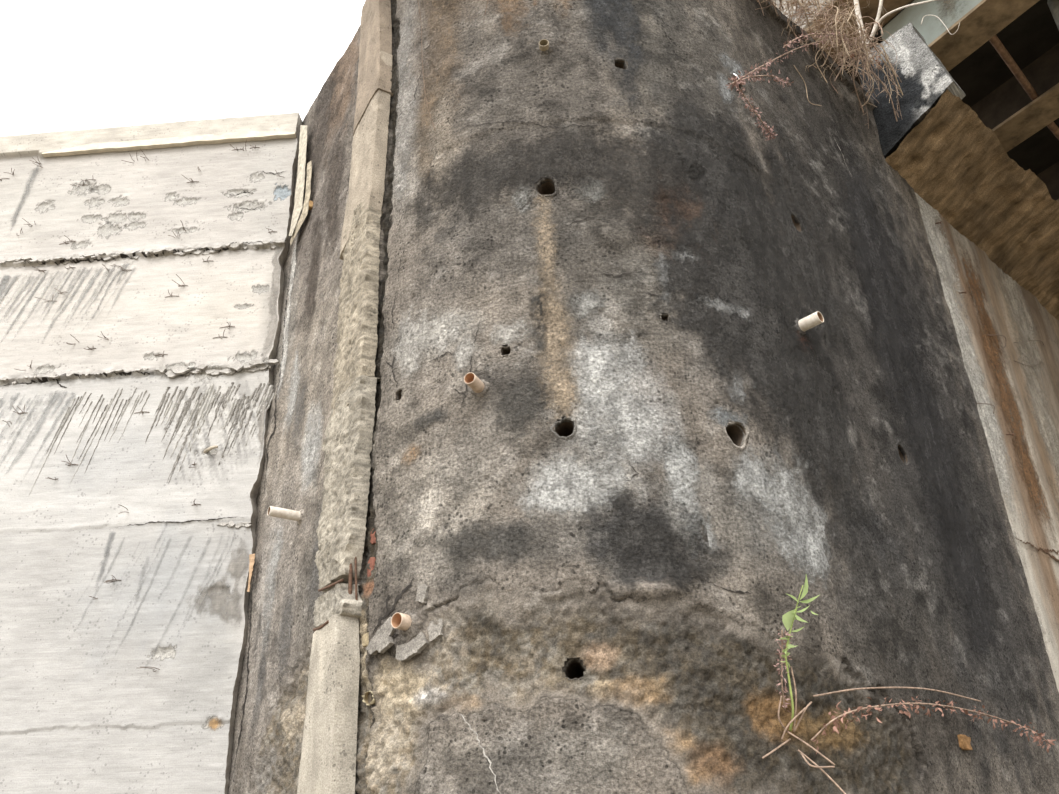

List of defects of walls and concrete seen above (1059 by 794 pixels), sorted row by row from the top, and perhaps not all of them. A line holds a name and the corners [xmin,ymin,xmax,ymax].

spalling [0,179,286,265]
spalling [224,172,291,221]
spalling [0,351,280,385]
leakage [395,305,474,372]
spalling [318,0,923,794]
leakage [415,102,868,587]
leakage [841,149,996,654]
leakage [917,197,1012,500]
crack [1015,537,1059,563]
crack [371,578,414,637]
spalling [250,620,329,794]
crack [461,714,499,791]